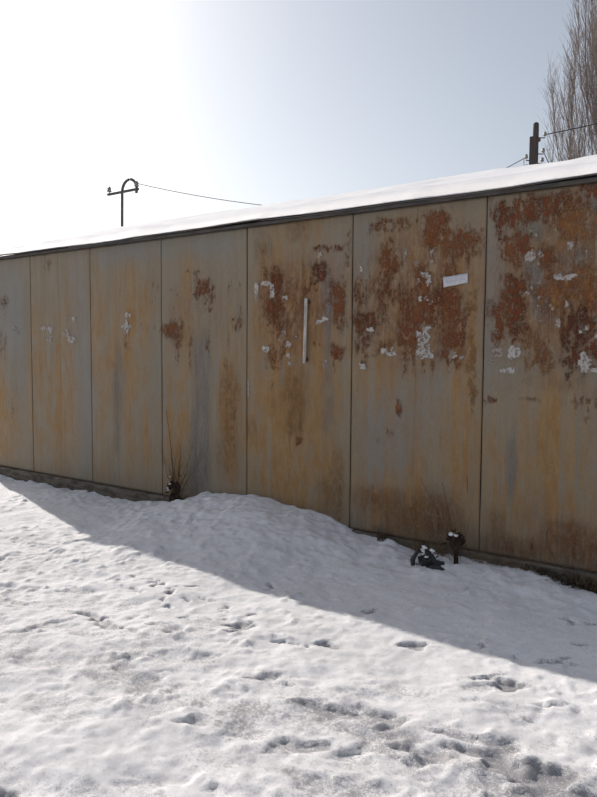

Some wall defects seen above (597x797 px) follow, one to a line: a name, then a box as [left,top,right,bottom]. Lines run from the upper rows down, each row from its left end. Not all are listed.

rust [261,211,481,412]
rust [486,183,597,379]